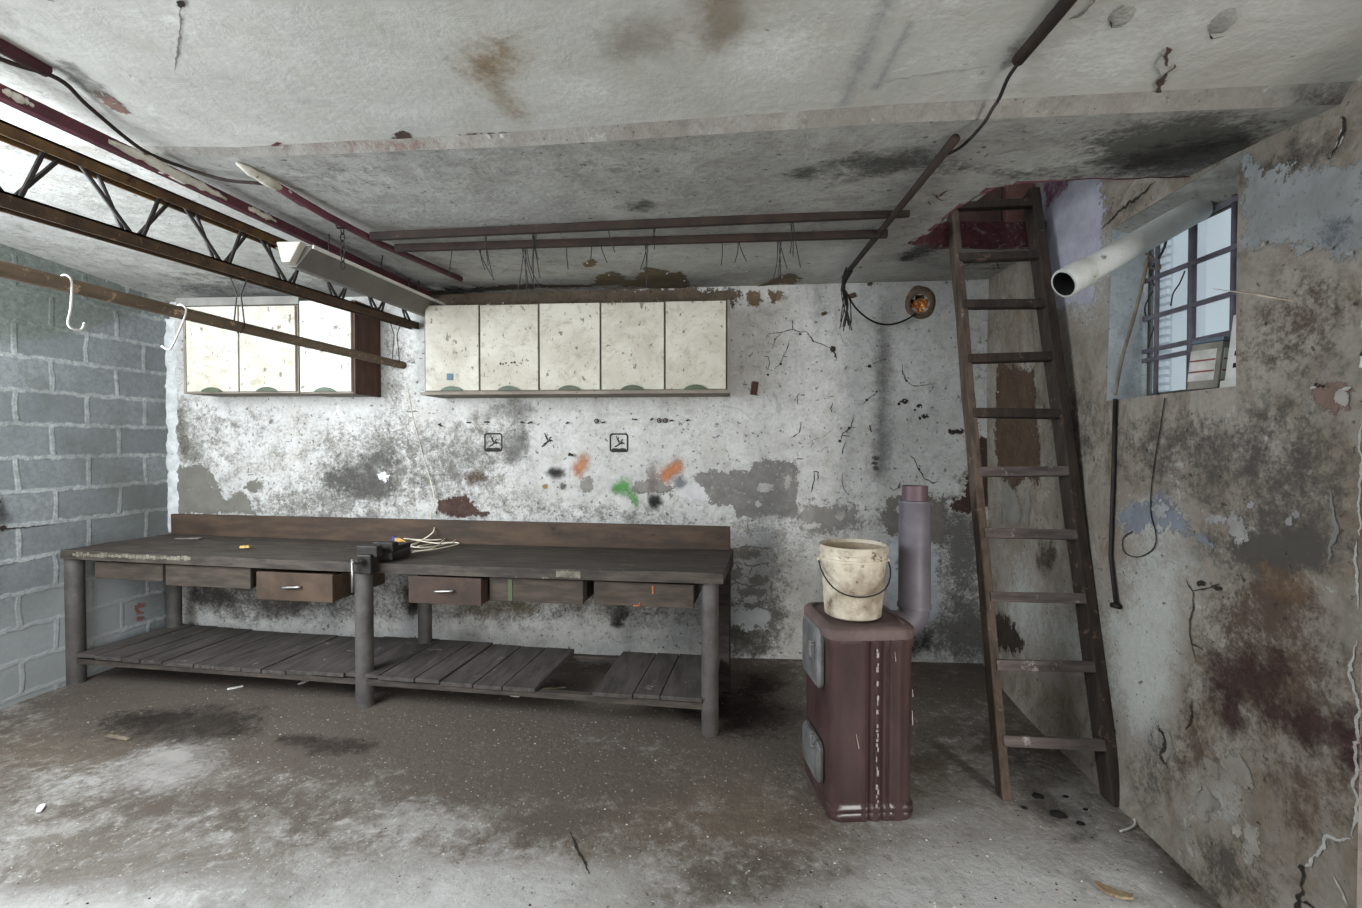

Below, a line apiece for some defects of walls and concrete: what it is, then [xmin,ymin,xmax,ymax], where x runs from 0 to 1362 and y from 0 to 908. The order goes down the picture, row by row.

leakage [319,450,398,499]
crack [0,498,53,531]
peeling [435,493,490,518]
peeling [632,457,859,608]
leakage [1204,646,1362,772]